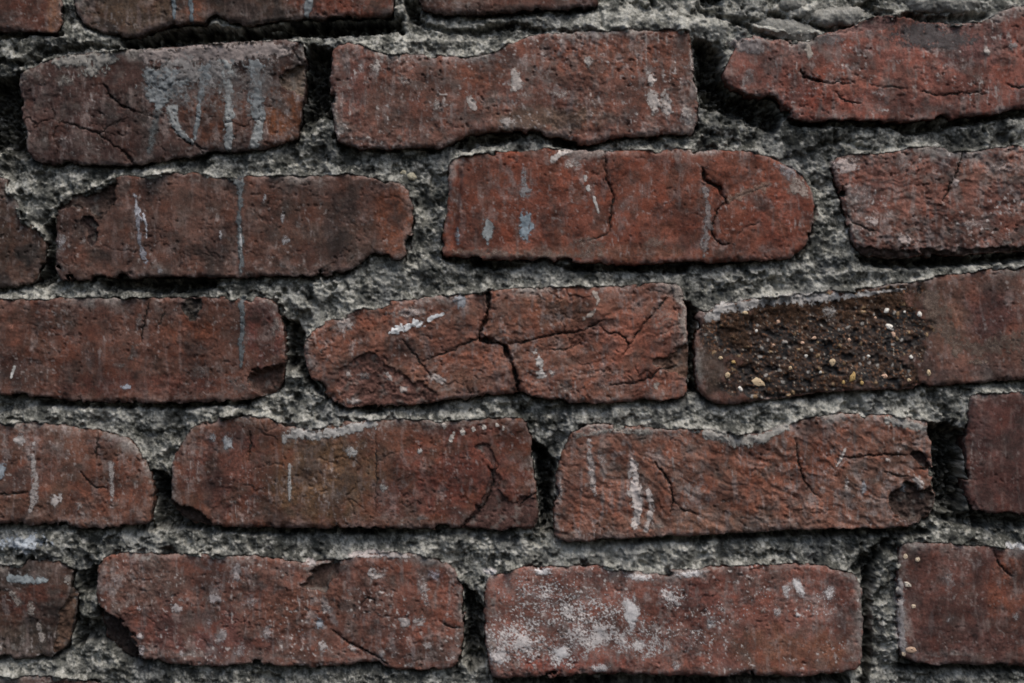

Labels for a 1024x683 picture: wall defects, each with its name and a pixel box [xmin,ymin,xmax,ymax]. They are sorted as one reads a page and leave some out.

crack [65,90,152,162]
crack [594,160,615,239]
crack [701,172,726,244]
crack [407,293,669,391]
spalling [699,282,936,401]
efflorescence [483,567,835,673]